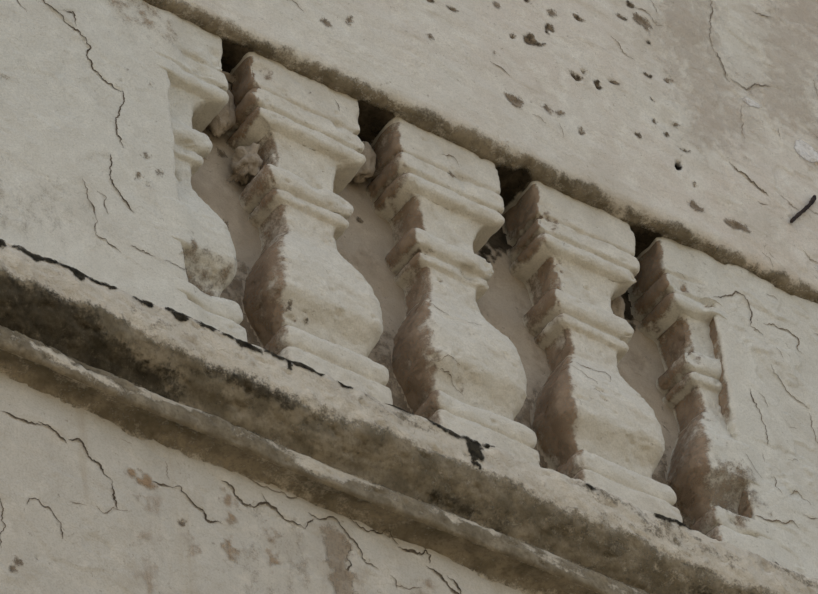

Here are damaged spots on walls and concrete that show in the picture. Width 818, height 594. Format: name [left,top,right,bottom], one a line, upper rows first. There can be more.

spalling [510,9,557,46]
spalling [617,1,653,31]
crack [17,0,185,270]
spalling [506,93,524,108]
spalling [725,218,752,232]
damp [165,307,234,339]
damp [524,257,596,490]
damp [632,240,722,541]
damp [709,318,729,417]
crack [714,291,818,442]
crack [2,411,128,513]
crack [221,480,461,594]